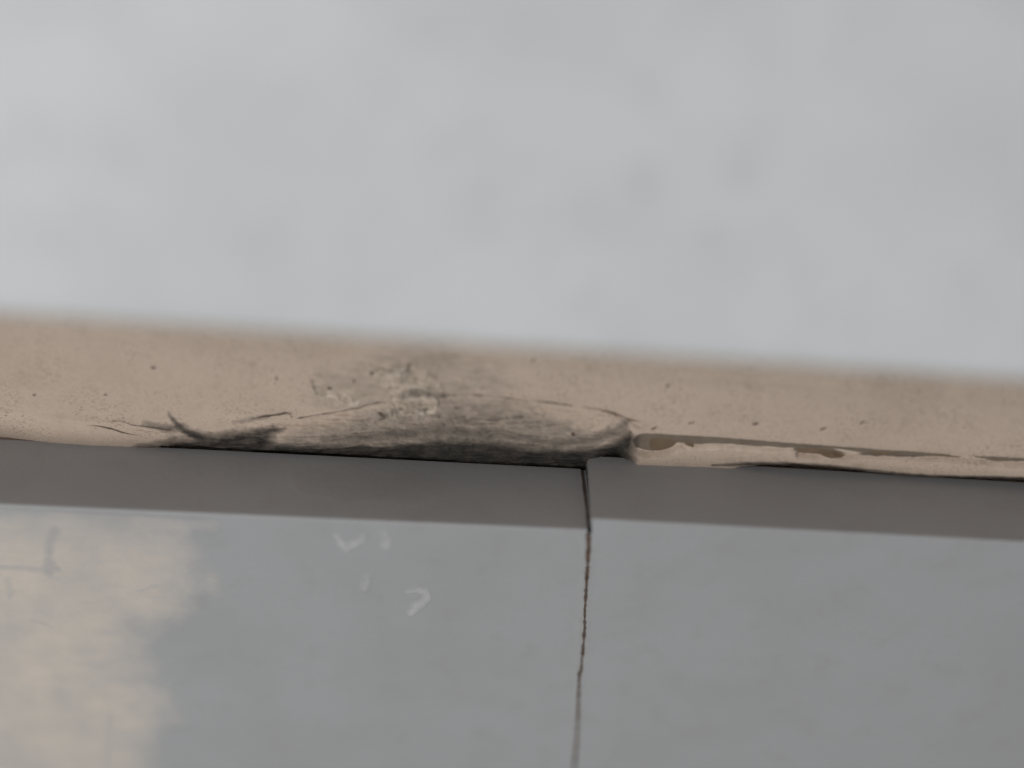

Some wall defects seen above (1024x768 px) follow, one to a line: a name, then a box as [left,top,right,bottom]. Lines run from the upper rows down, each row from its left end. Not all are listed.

peeling [632,432,1024,464]
crack [579,470,592,534]